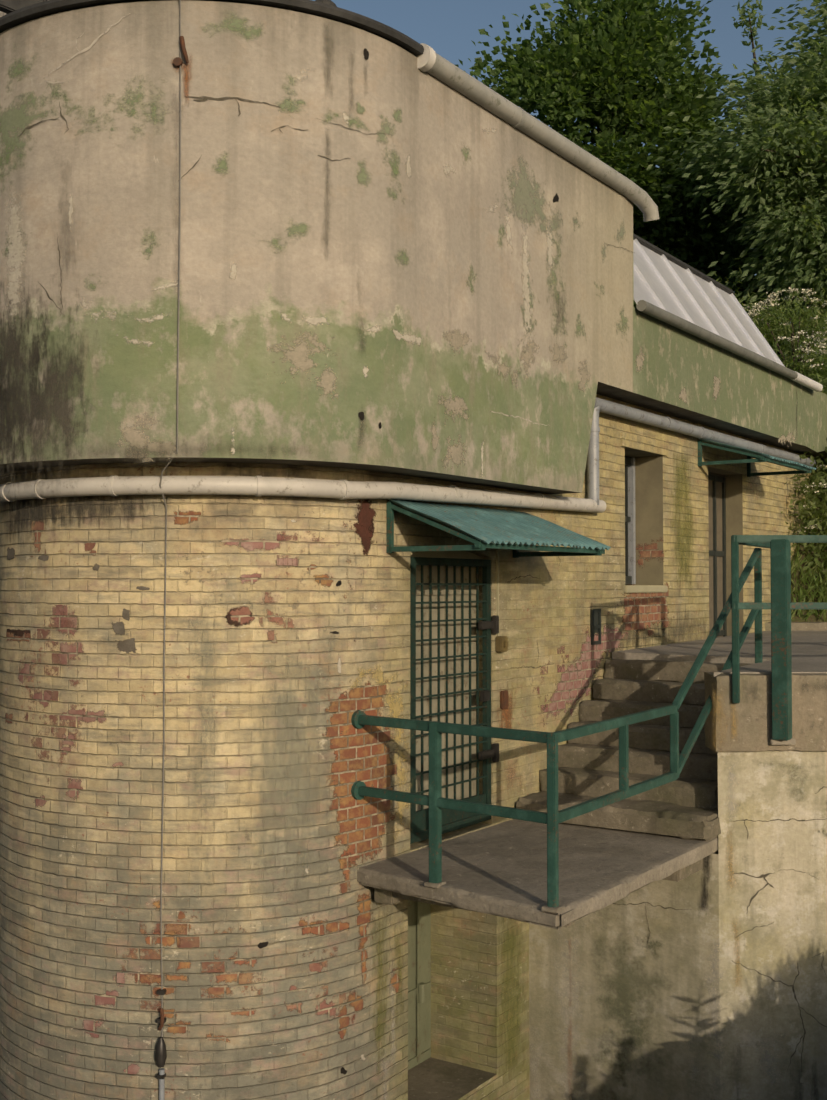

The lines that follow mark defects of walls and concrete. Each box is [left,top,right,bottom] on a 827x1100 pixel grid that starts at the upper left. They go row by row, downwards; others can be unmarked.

crack [20,13,130,135]
crack [185,96,393,136]
leakage [0,300,85,469]
flaking render [5,604,106,763]
spalling [225,592,294,643]
flaking render [221,519,351,598]
spalling [343,499,377,562]
flaking render [532,583,670,724]
flaking render [299,681,397,1039]
crack [733,786,825,839]
flaking render [82,901,268,1038]
crack [732,869,827,1070]